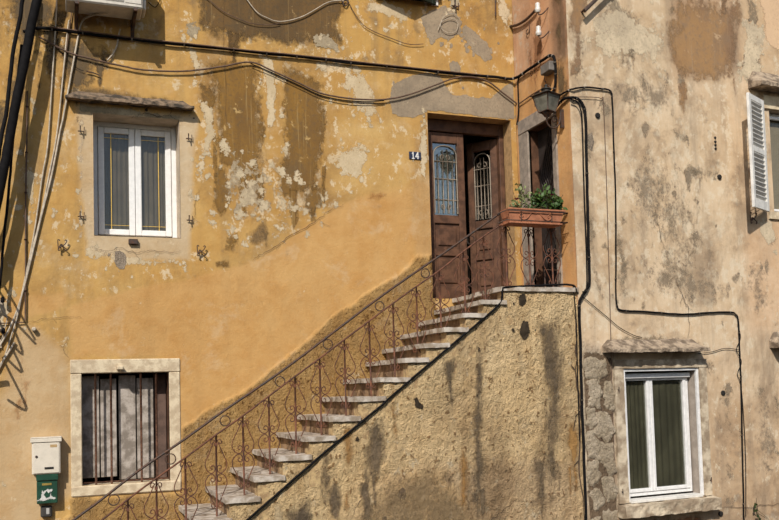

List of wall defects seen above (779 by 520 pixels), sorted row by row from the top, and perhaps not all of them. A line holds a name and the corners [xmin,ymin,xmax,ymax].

flaking render [79,103,180,125]
peeling [190,98,339,247]
damp [199,0,343,228]
peeling [313,33,382,128]
peeling [334,137,371,183]
damp [620,74,665,106]
damp [668,0,758,109]
peeling [72,238,187,272]
flaking render [582,352,623,520]